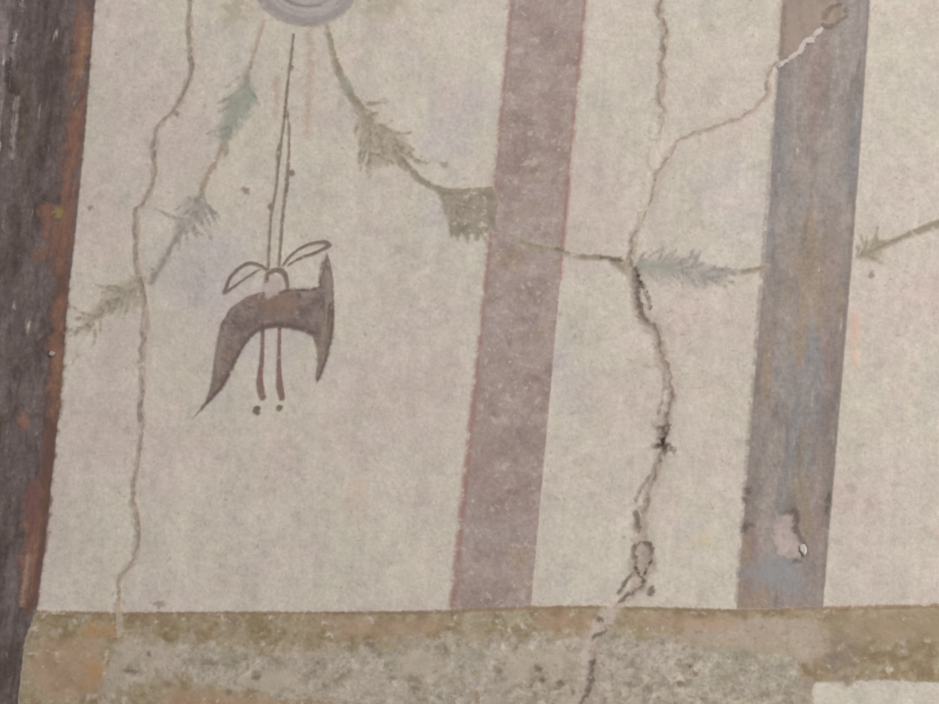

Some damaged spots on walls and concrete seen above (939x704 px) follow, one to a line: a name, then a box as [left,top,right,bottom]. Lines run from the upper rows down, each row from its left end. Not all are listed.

crack [115,0,195,634]
crack [563,0,823,704]
spalling [773,507,809,562]